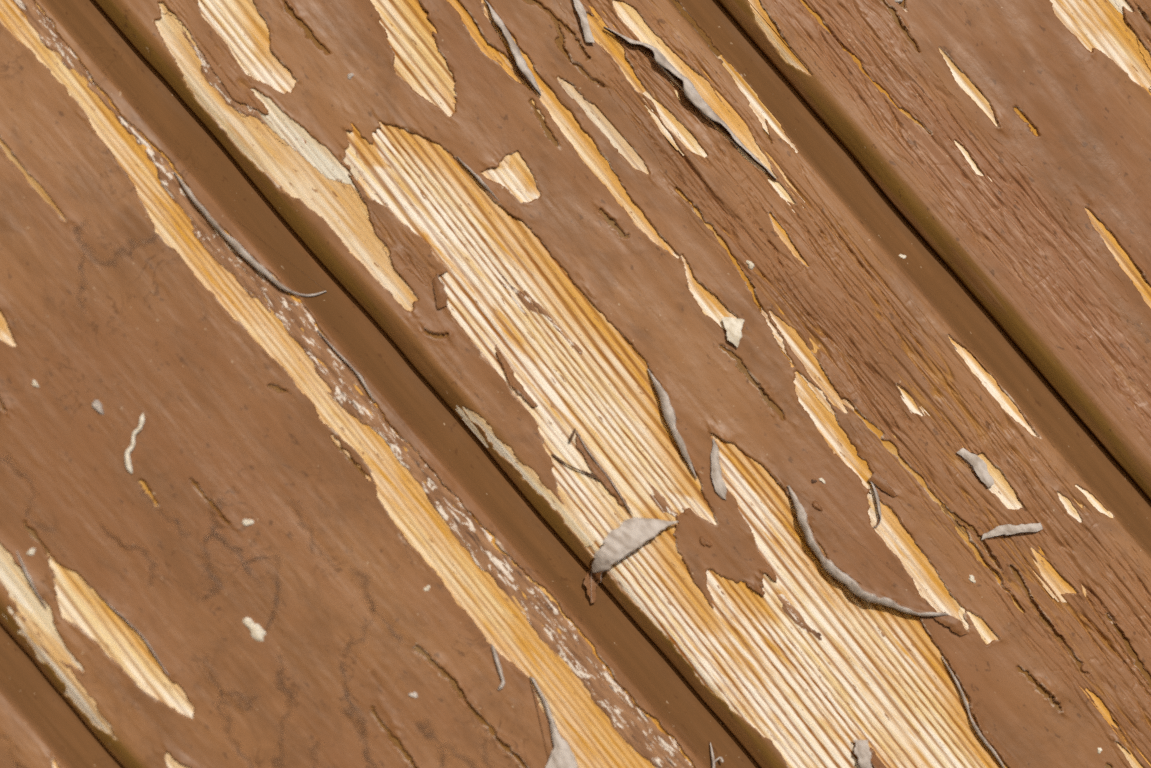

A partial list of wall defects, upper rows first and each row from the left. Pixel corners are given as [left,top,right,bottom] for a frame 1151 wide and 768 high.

peeling [1050,0,1151,95]
peeling [1085,208,1151,308]
peeling [0,310,17,346]
crack [424,330,448,339]
peeling [155,0,1008,768]
crack [524,0,1151,768]
peeling [948,336,1038,437]
peeling [956,446,1023,509]
peeling [981,523,1043,540]
peeling [1031,546,1087,603]
peeling [0,543,194,739]
crack [414,644,527,768]